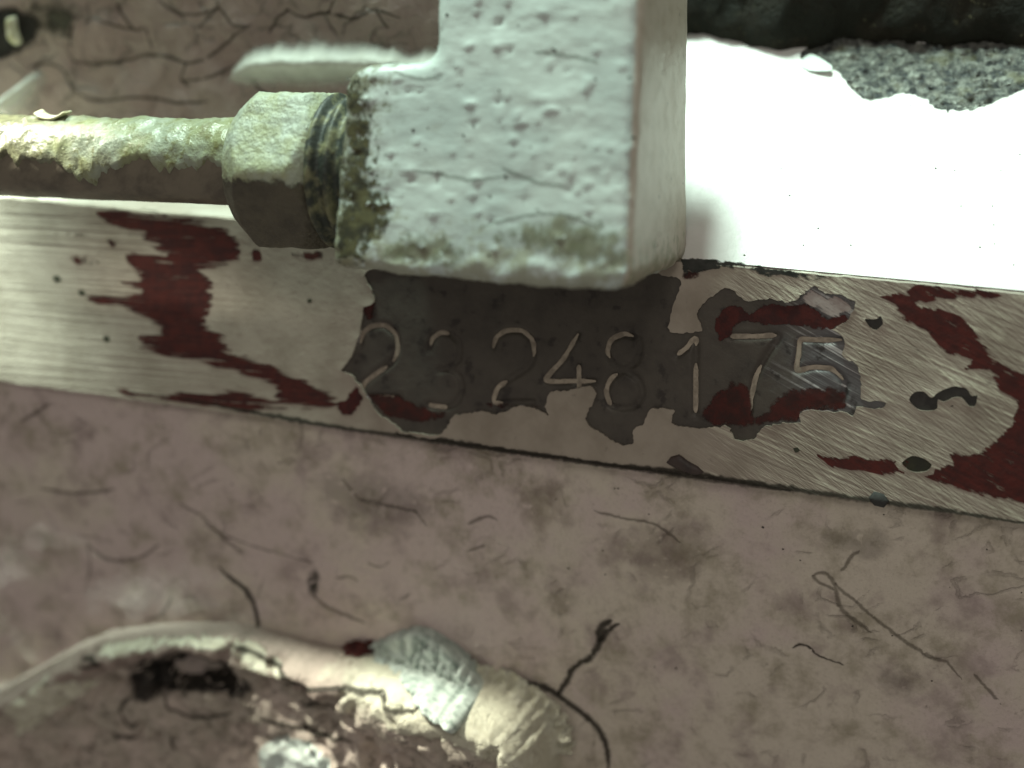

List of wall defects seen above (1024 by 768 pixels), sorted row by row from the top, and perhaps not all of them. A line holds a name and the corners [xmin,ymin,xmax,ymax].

crack [29,0,401,104]
peeling [342,258,886,445]
peeling [909,386,977,411]
spalling [129,651,251,703]
peeling [369,626,484,734]
crack [526,619,620,768]
crack [793,643,843,665]